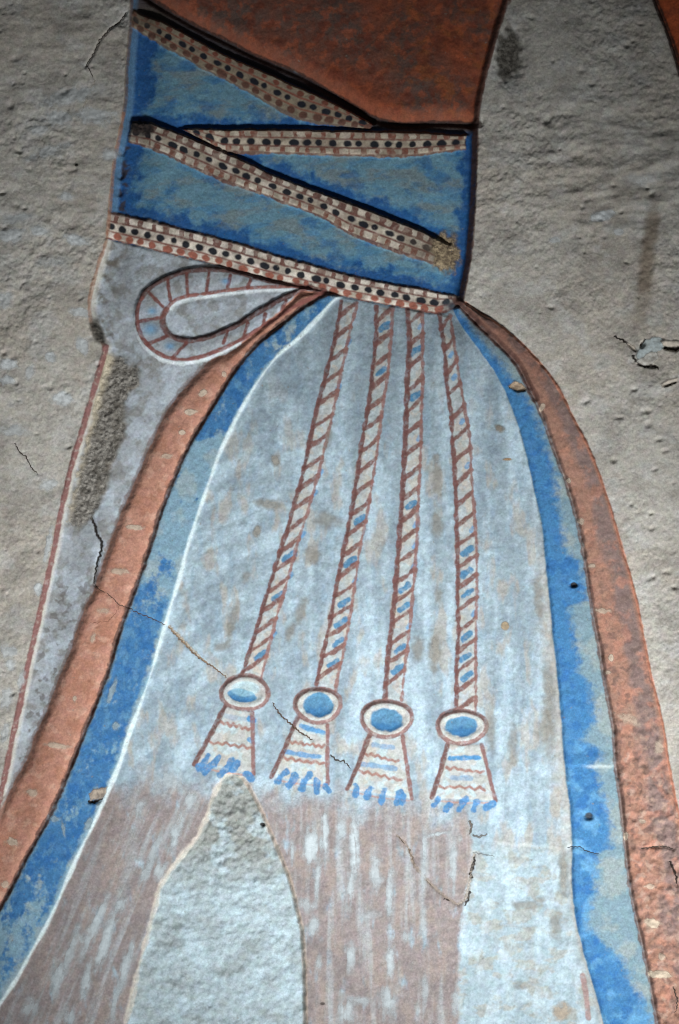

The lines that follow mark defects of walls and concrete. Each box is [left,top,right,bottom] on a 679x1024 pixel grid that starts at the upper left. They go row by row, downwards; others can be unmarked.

crack [86,12,127,77]
spalling [431,231,460,271]
flaking render [614,336,679,370]
flaking render [69,356,139,526]
crack [90,516,226,677]
crack [273,703,351,769]
crack [399,820,487,906]